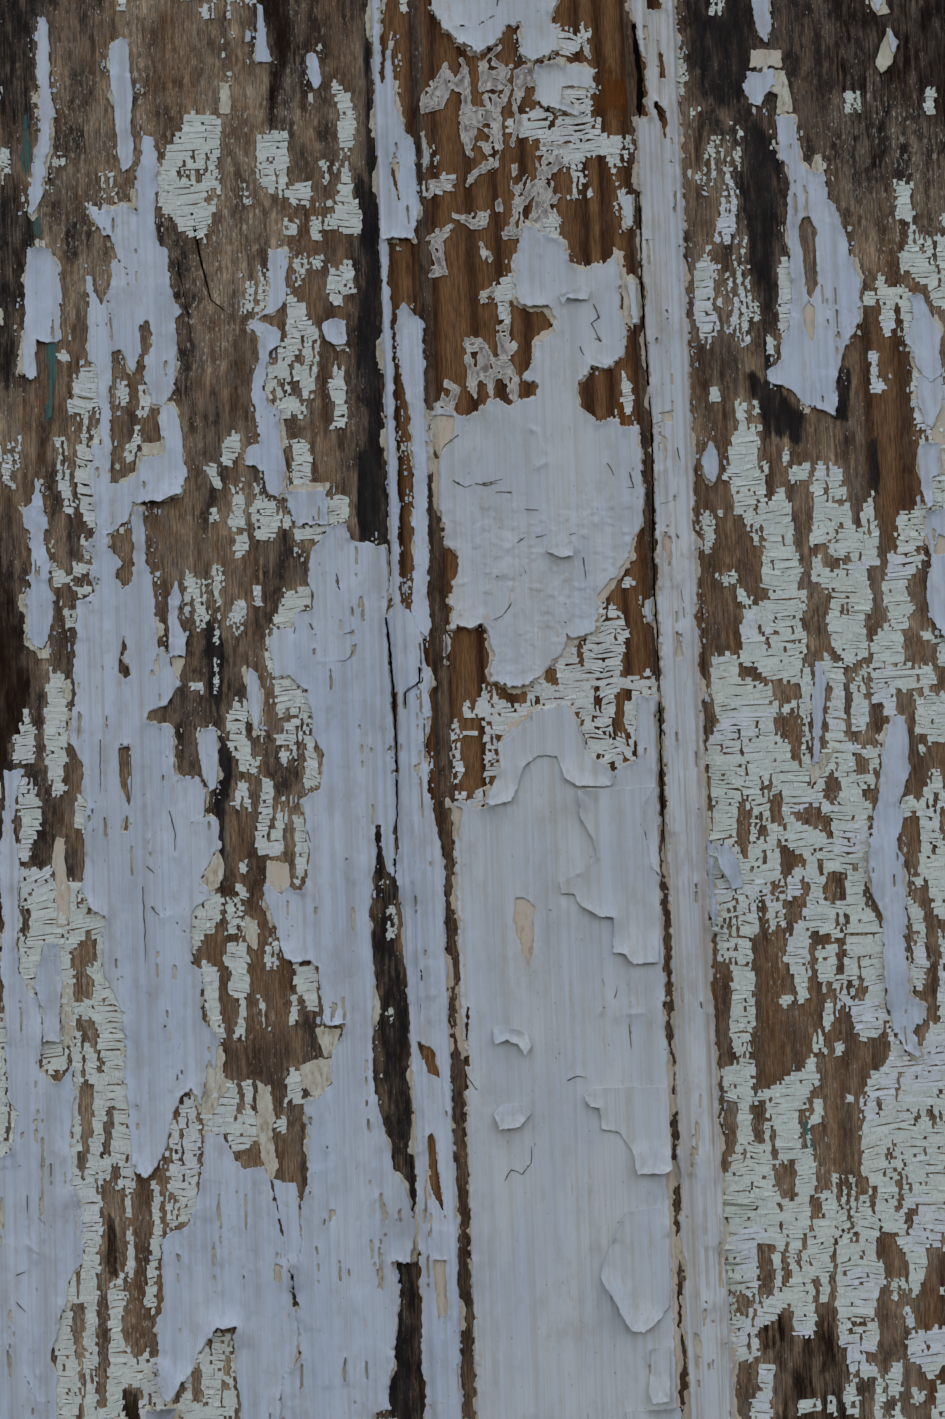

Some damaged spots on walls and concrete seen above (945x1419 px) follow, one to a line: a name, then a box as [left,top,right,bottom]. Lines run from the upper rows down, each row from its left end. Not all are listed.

peeling [181,0,277,65]
peeling [751,0,776,43]
peeling [866,0,899,73]
peeling [0,17,69,221]
peeling [254,43,363,241]
peeling [694,136,747,261]
peeling [14,239,71,380]
peeling [693,246,762,349]
peeling [742,49,945,746]
peeling [222,665,288,857]
peeling [223,883,260,1040]
peeling [902,1306,945,1419]